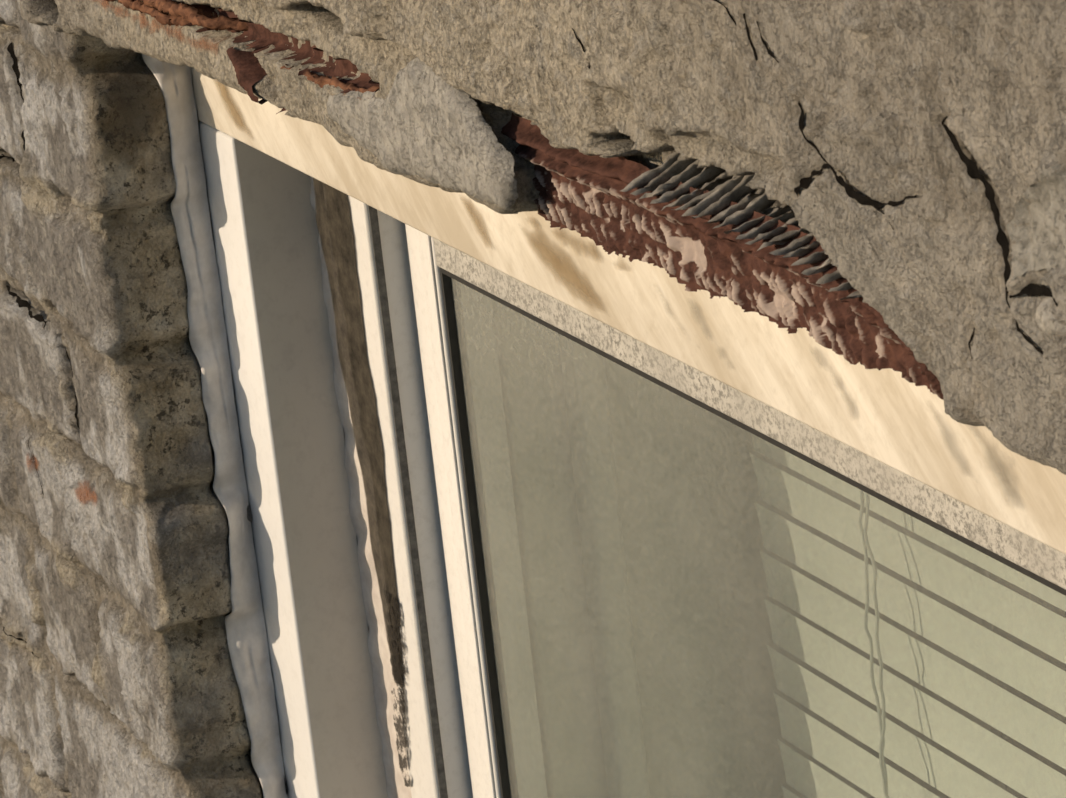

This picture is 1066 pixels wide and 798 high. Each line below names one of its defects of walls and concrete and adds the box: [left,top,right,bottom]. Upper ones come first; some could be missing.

crack [7,42,24,103]
corrosion [104,0,380,105]
crack [713,0,779,63]
crack [794,101,917,230]
corrosion [501,113,944,400]
crack [941,116,1058,358]
leakage [313,178,411,787]